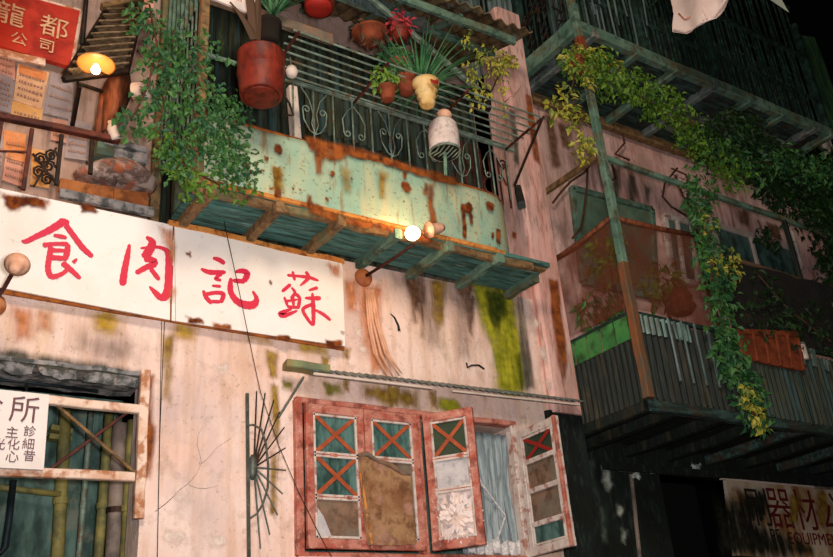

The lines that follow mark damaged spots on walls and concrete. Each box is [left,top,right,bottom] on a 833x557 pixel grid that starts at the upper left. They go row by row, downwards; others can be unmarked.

leakage [510,110,519,164]
rust [203,118,504,237]
rust [163,230,175,258]
rust [416,202,506,254]
leakage [406,278,445,328]
leakage [454,284,533,395]